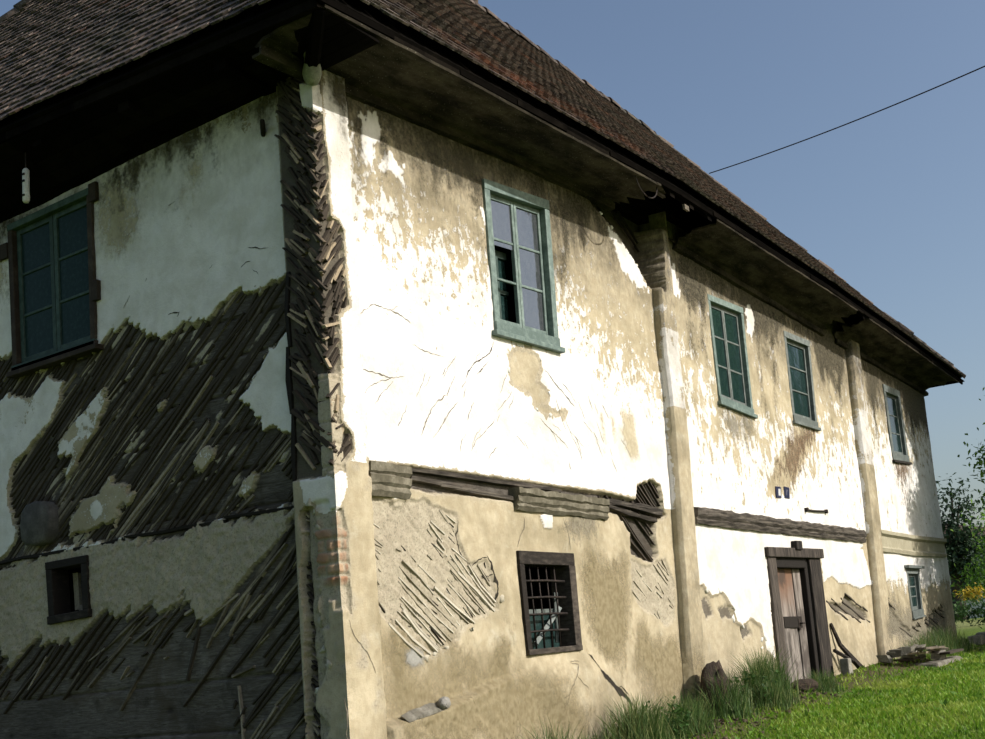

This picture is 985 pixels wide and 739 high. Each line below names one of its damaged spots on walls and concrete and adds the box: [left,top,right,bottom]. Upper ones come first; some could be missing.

water stain [99,125,211,246]
water stain [322,71,615,278]
peeling [347,100,658,427]
flaking render [0,374,64,559]
flaking render [58,387,107,477]
flaking render [68,475,135,536]
flaking render [193,445,215,471]
flaking render [239,333,291,433]
crack [363,346,514,458]
water stain [677,252,929,437]
crack [560,654,633,706]
peeling [700,583,776,694]